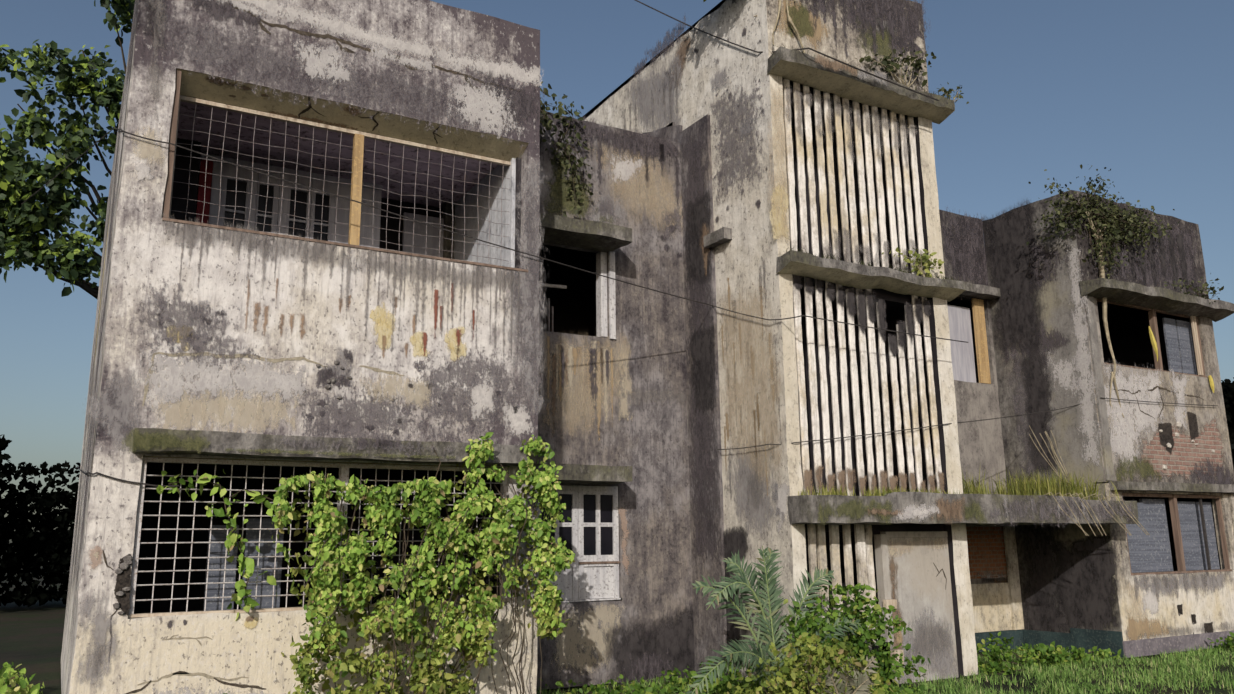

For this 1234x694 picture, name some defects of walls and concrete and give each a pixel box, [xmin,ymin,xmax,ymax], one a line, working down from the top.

crack [228,4,522,92]
crack [298,97,324,119]
corrosion [246,278,305,337]
water stain [66,0,545,682]
corrosion [405,283,454,356]
water stain [555,16,789,564]
water stain [805,276,931,357]
water stain [942,201,1200,482]
crack [1114,386,1204,419]
peeling [1103,364,1226,480]
flaking render [90,546,133,660]
crack [125,635,266,694]